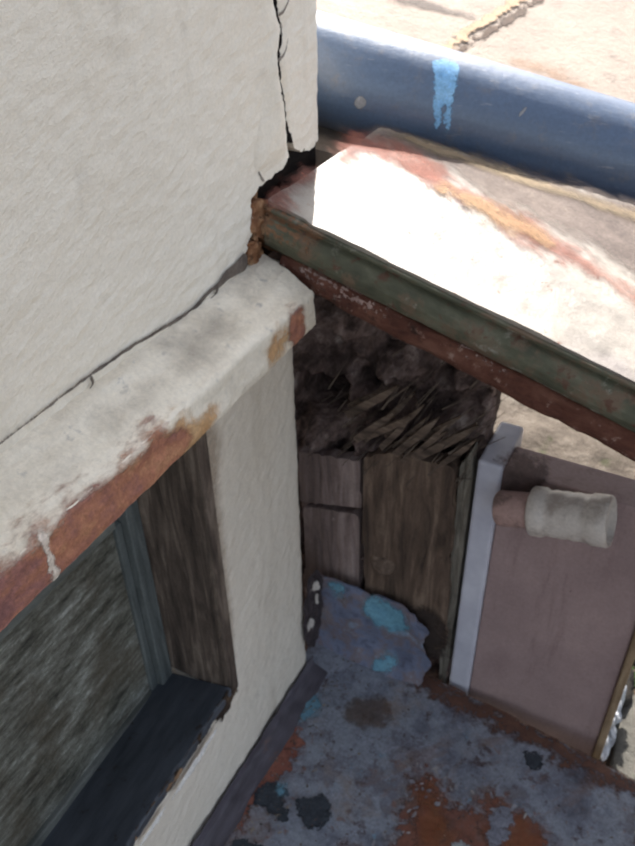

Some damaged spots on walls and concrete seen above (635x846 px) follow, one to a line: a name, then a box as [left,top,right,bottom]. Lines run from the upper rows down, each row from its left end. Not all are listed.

crack [273,0,293,143]
corrosion [340,133,635,299]
corrosion [268,307,306,362]
corrosion [0,408,217,632]
corrosion [232,727,306,834]
corrosion [369,762,548,846]
corrosion [415,674,635,797]